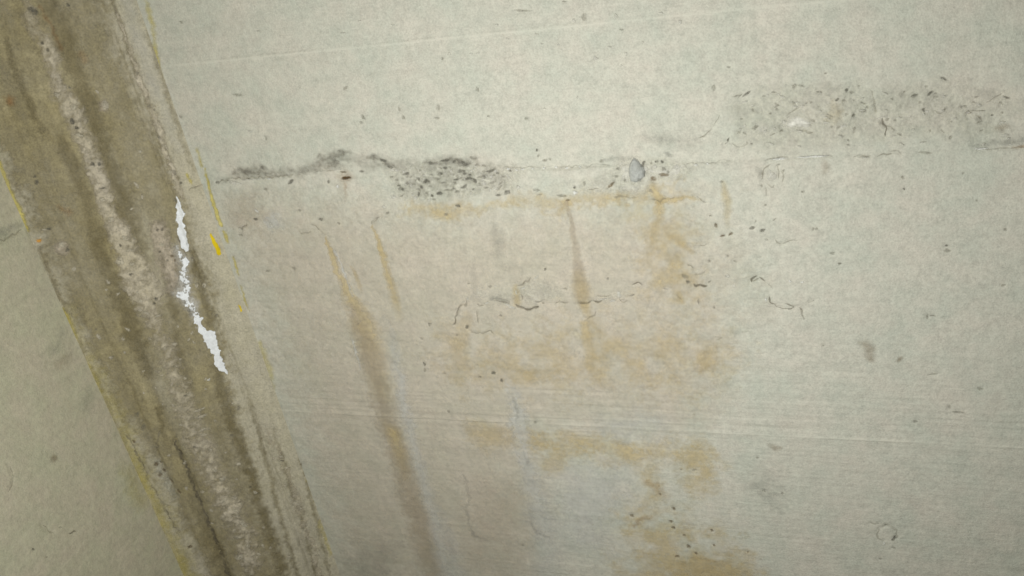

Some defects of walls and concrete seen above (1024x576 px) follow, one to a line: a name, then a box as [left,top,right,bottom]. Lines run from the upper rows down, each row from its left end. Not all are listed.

damp [0,0,286,576]
spalling [24,5,271,575]